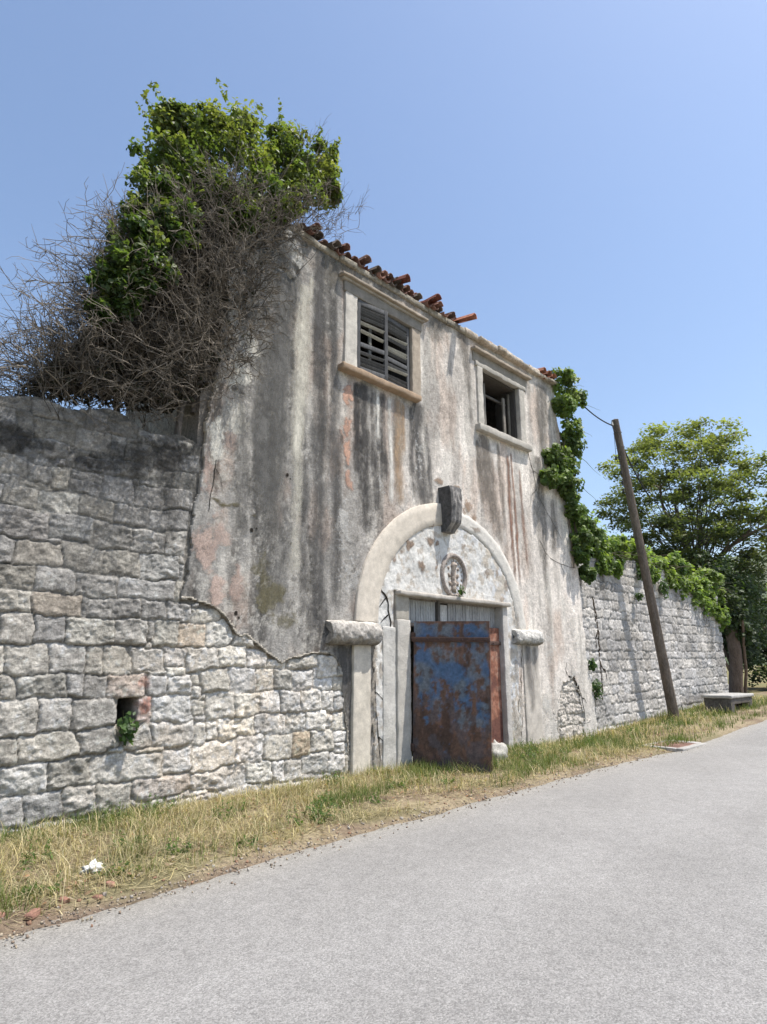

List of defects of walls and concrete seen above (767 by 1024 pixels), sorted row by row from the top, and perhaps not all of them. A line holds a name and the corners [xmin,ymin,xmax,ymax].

water stain [238,225,346,625]
peeling [341,418,353,490]
peeling [343,385,353,404]
water stain [353,383,394,527]
water stain [410,402,433,505]
water stain [476,434,503,536]
corrosion [507,456,527,573]
water stain [535,387,557,577]
flaking render [551,669,591,742]